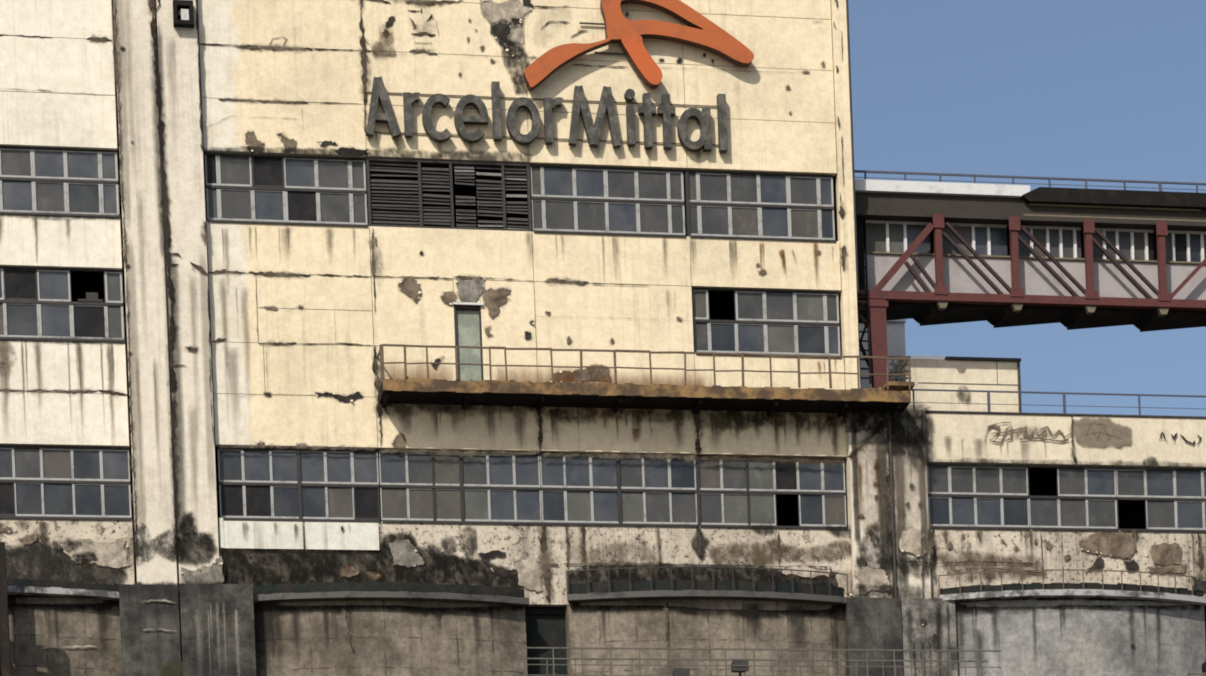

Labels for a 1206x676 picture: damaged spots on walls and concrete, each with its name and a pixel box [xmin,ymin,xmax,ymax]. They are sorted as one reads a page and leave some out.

spalling [467,0,533,63]
spalling [398,278,422,303]
spalling [440,278,511,336]
water stain [0,337,126,403]
water stain [19,521,97,563]
water stain [127,512,216,564]
spalling [478,550,543,592]
spalling [1064,532,1206,593]
water stain [913,605,949,668]